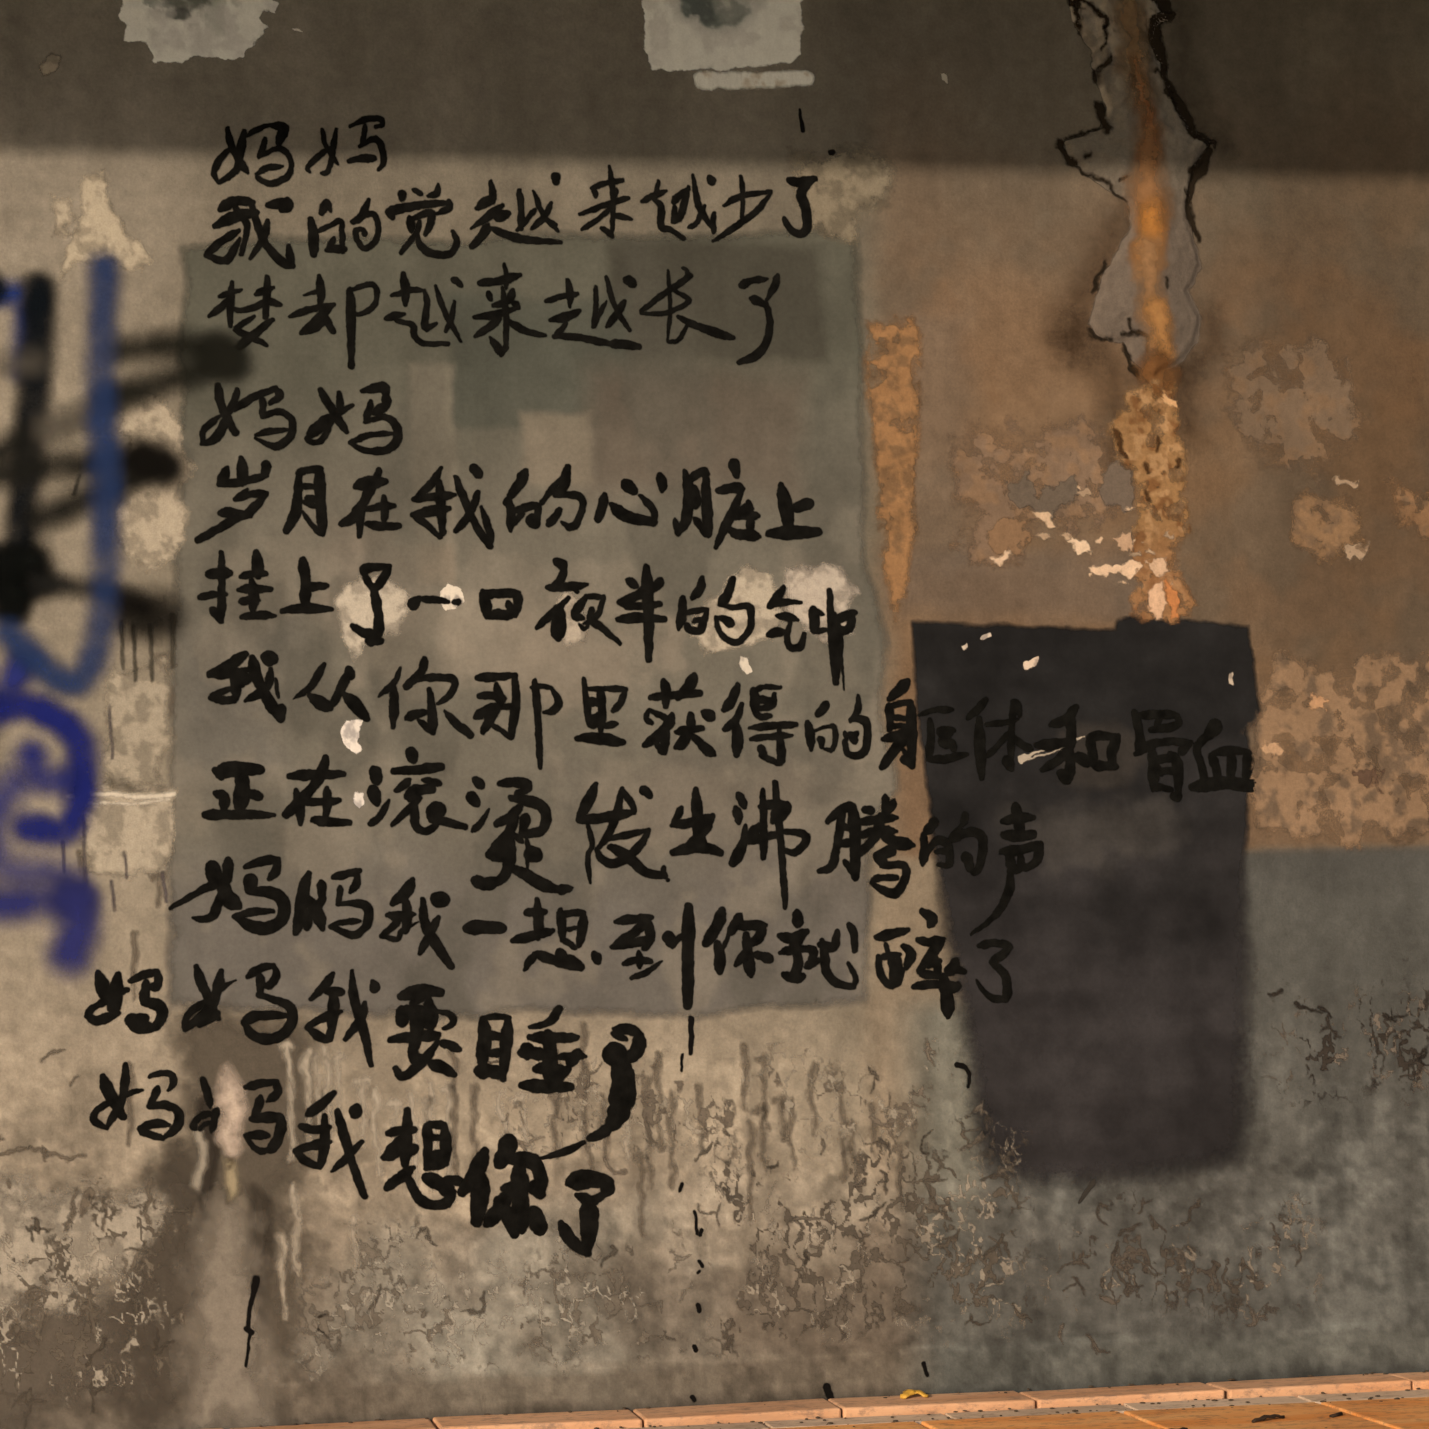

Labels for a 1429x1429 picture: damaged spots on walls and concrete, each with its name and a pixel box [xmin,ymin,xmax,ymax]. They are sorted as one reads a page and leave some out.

rust [1115,0,1176,399]
peeling [863,317,922,610]
peeling [950,380,1196,624]
peeling [1222,336,1369,565]
peeling [1250,651,1429,848]
crack [41,1049,77,1087]
crack [0,1138,108,1231]
crack [144,1177,155,1224]